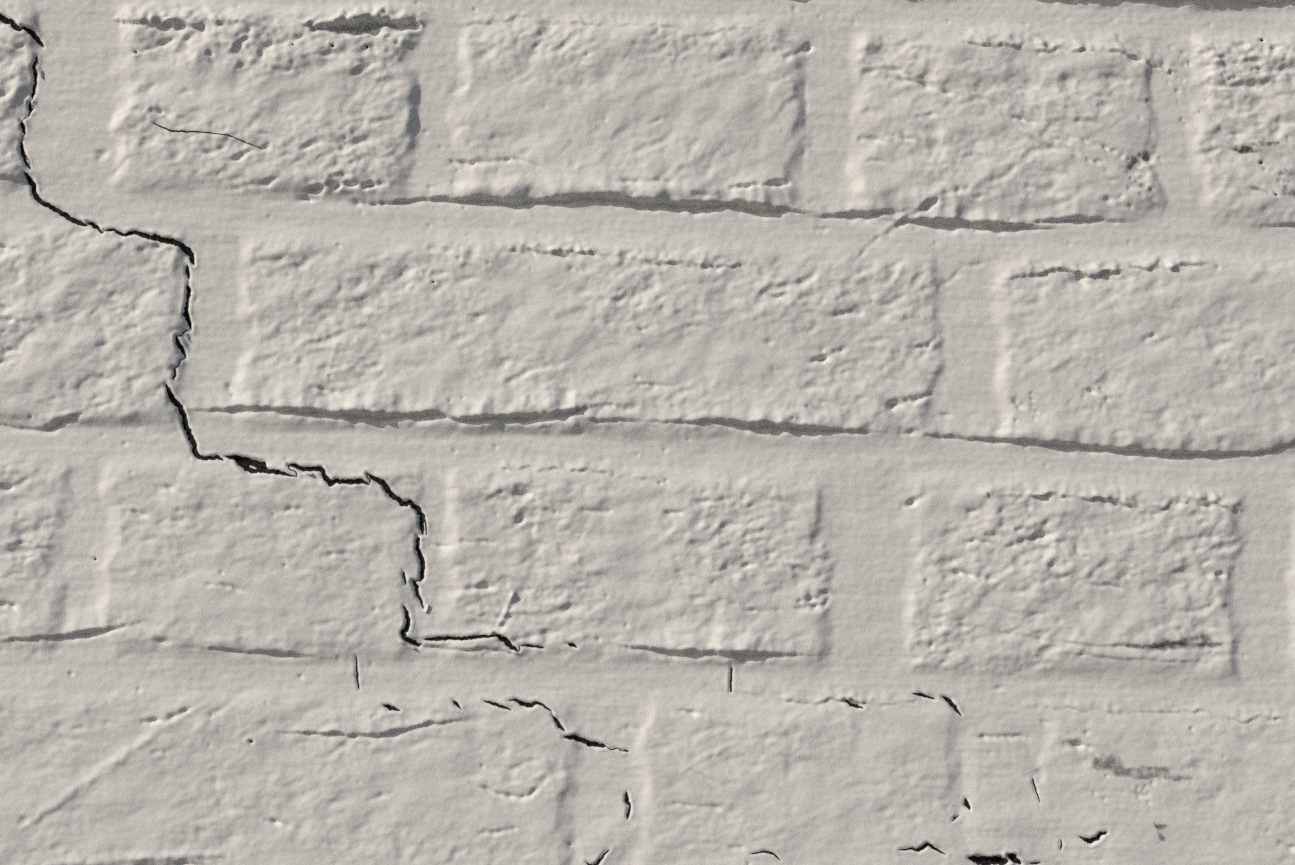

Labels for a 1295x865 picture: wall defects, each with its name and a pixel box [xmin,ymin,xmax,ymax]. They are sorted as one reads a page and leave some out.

crack [0,13,577,652]
crack [355,656,400,711]
crack [912,693,961,716]
crack [751,851,780,860]
crack [899,843,946,855]
crack [1060,831,1107,850]